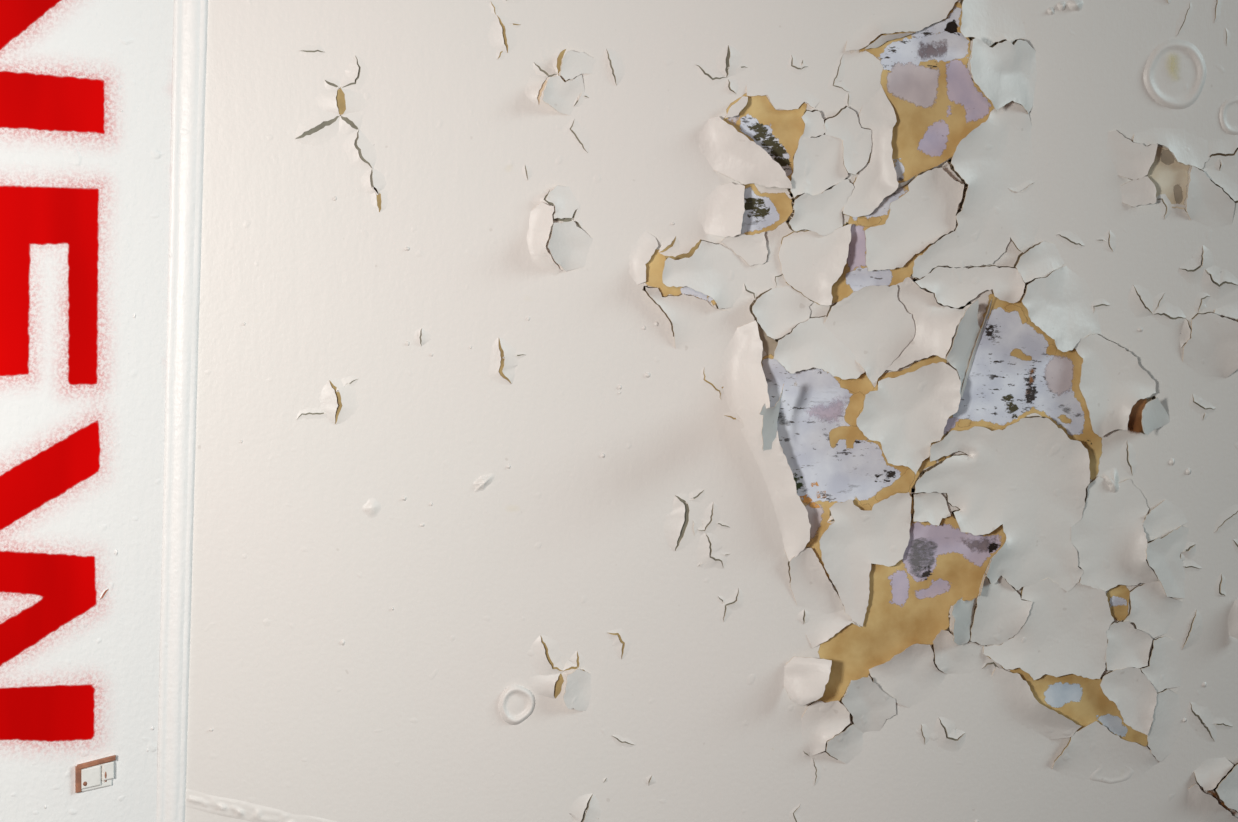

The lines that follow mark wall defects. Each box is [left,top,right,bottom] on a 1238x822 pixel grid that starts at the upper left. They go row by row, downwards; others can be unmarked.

crack [295,45,388,212]
peeling [1107,128,1235,227]
peeling [629,0,1189,780]
peeling [1188,757,1238,822]